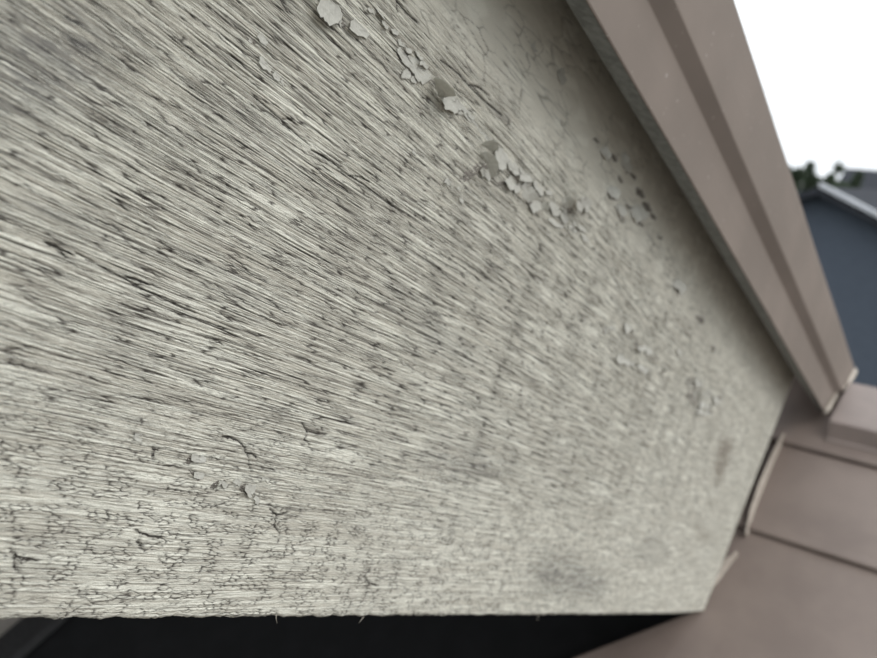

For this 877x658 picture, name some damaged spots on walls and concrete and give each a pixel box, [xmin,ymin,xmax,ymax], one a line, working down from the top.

peeling [317,0,369,39]
peeling [248,33,284,85]
crack [441,60,499,113]
peeling [367,7,592,243]
peeling [592,137,656,228]
peeling [602,322,654,374]
peeling [185,454,270,505]